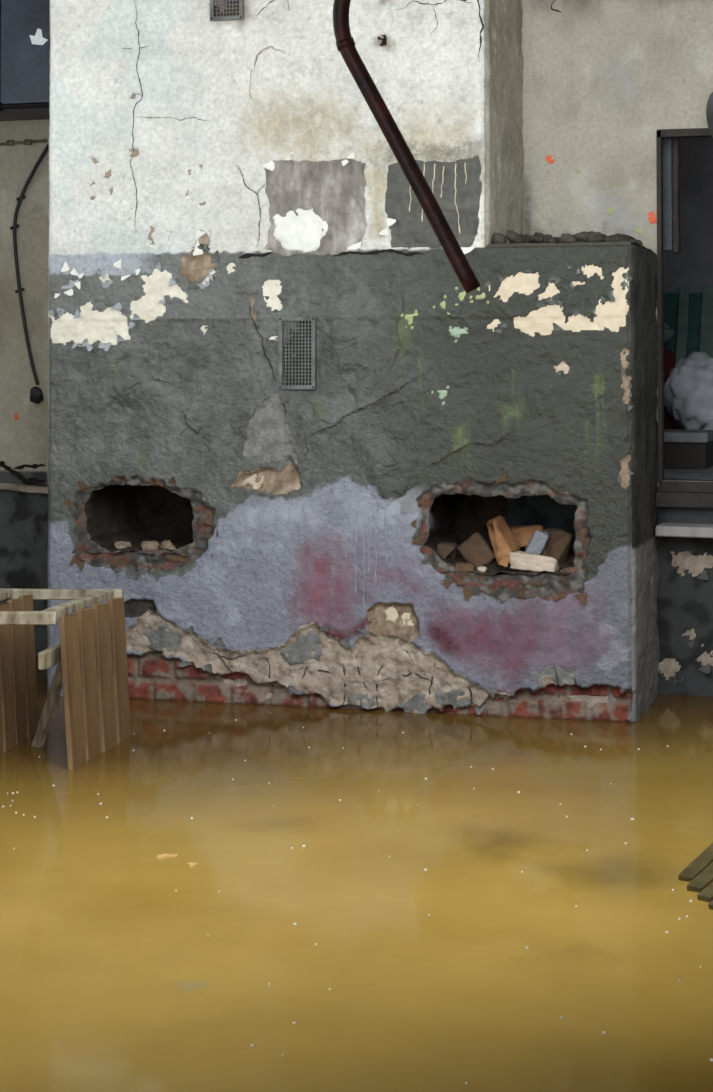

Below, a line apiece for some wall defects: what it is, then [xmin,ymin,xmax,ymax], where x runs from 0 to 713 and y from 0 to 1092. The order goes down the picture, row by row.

crack [123,2,206,237]
crack [249,46,283,100]
crack [395,0,484,63]
peeling [262,152,368,256]
peeling [48,229,236,351]
peeling [483,265,633,337]
peeling [620,348,633,412]
flaking render [231,380,306,495]
flaking render [64,475,218,573]
flaking render [411,473,592,604]
peeling [670,551,713,580]
flaking render [124,599,633,723]